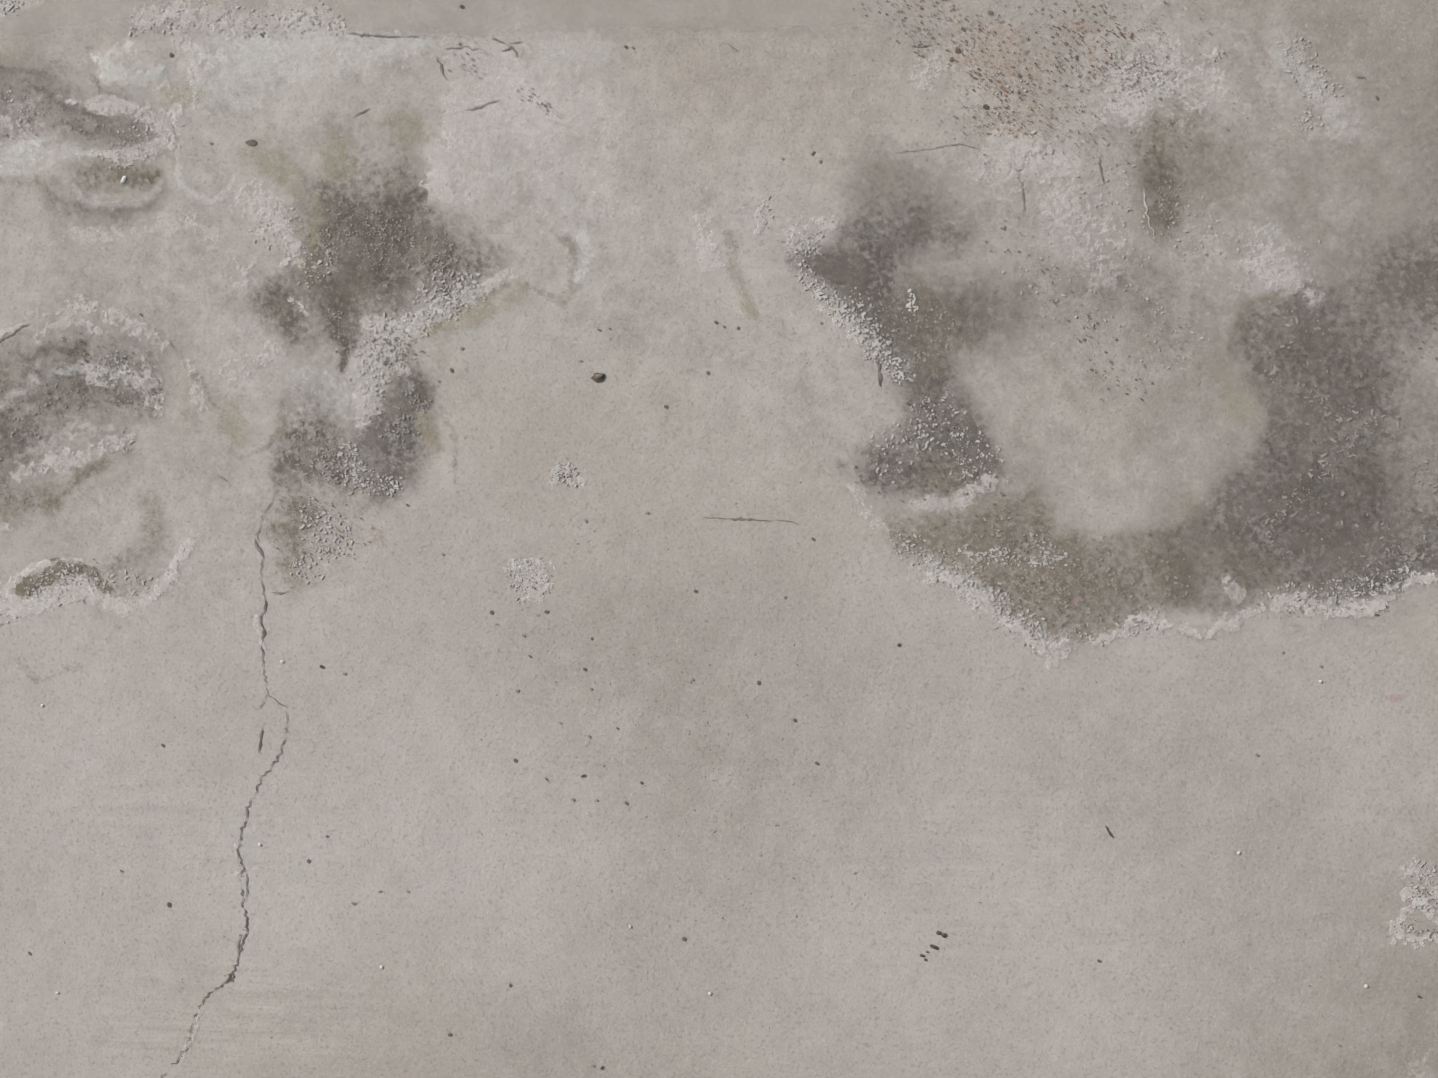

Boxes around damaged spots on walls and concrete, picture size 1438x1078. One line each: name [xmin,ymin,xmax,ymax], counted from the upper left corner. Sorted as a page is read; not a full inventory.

damp [0,503,195,626]
crack [161,489,288,1078]
damp [0,0,590,591]
damp [503,557,556,604]
damp [754,30,1438,670]